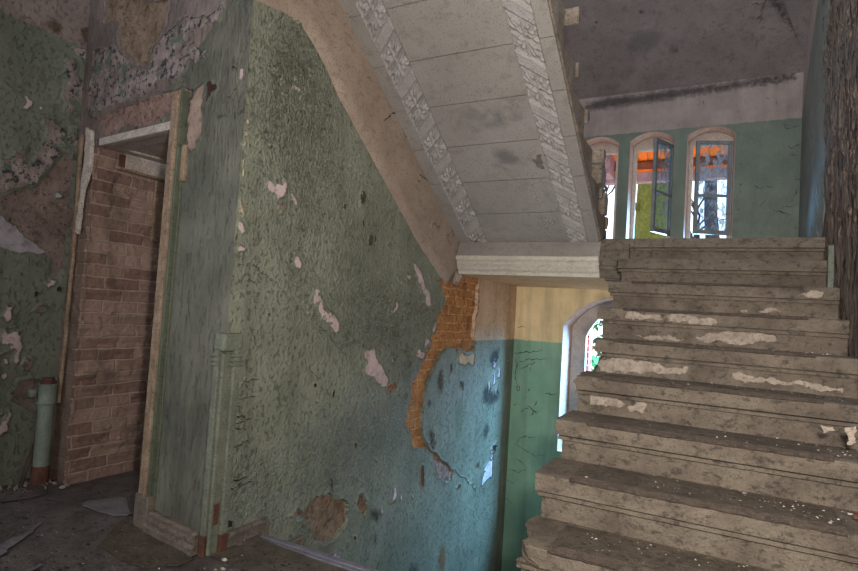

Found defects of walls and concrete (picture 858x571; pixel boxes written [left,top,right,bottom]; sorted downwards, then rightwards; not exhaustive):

peeling [0,1,226,196]
peeling [822,0,858,246]
peeling [263,176,299,208]
peeling [0,216,45,254]
peeling [625,311,777,345]
spalling [0,303,44,438]
peeling [597,358,688,375]
peeling [732,371,843,394]
spalling [282,259,482,551]
peeling [590,395,646,413]
peeling [821,425,857,445]